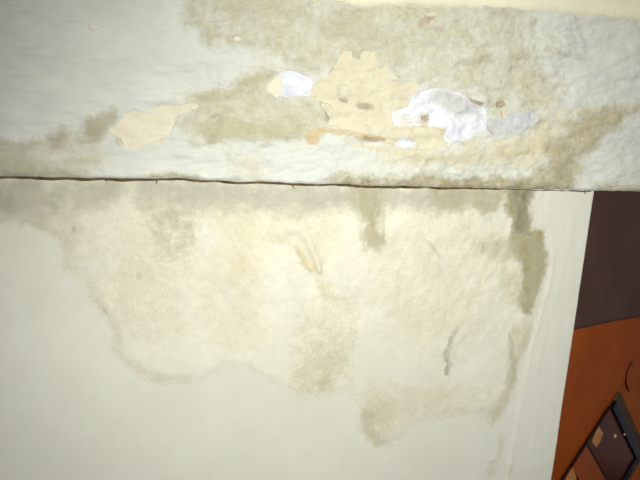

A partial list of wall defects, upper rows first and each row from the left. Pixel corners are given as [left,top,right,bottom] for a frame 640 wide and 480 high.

peeling [108,103,199,150]
damp [176,70,327,145]
peeling [266,50,536,150]
crack [0,176,591,194]
damp [0,105,640,446]